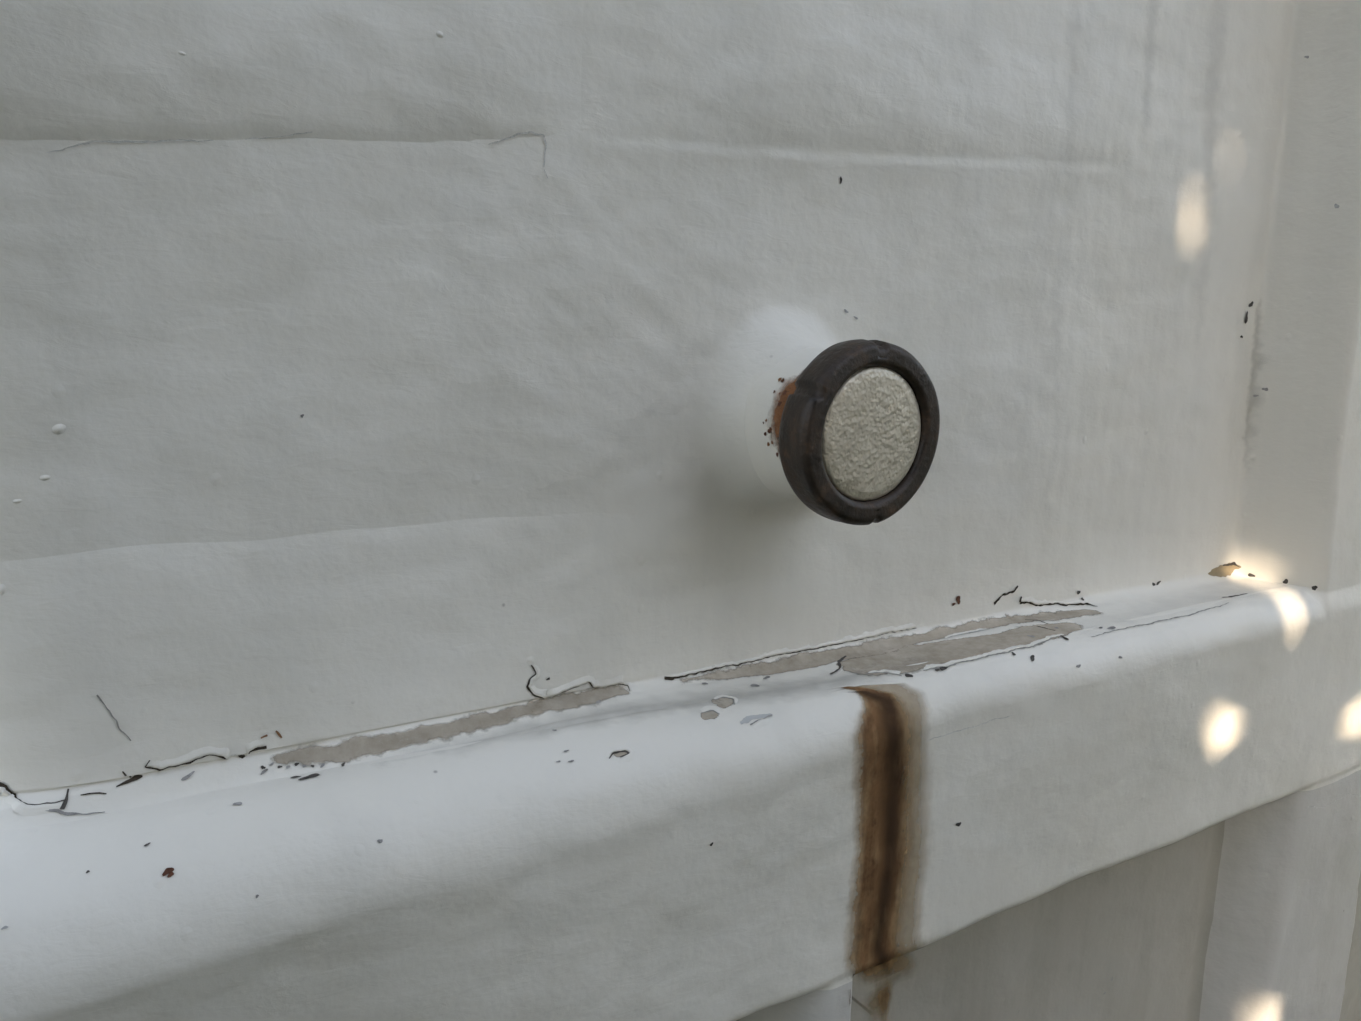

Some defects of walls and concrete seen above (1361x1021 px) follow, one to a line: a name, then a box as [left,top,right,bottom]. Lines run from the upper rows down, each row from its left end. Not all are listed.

corrosion [763,374,801,457]
peeling [1208,562,1255,577]
peeling [681,591,1116,730]
crack [0,730,282,816]
peeling [261,685,629,780]
peeling [603,745,636,762]
corrosion [835,684,922,1014]